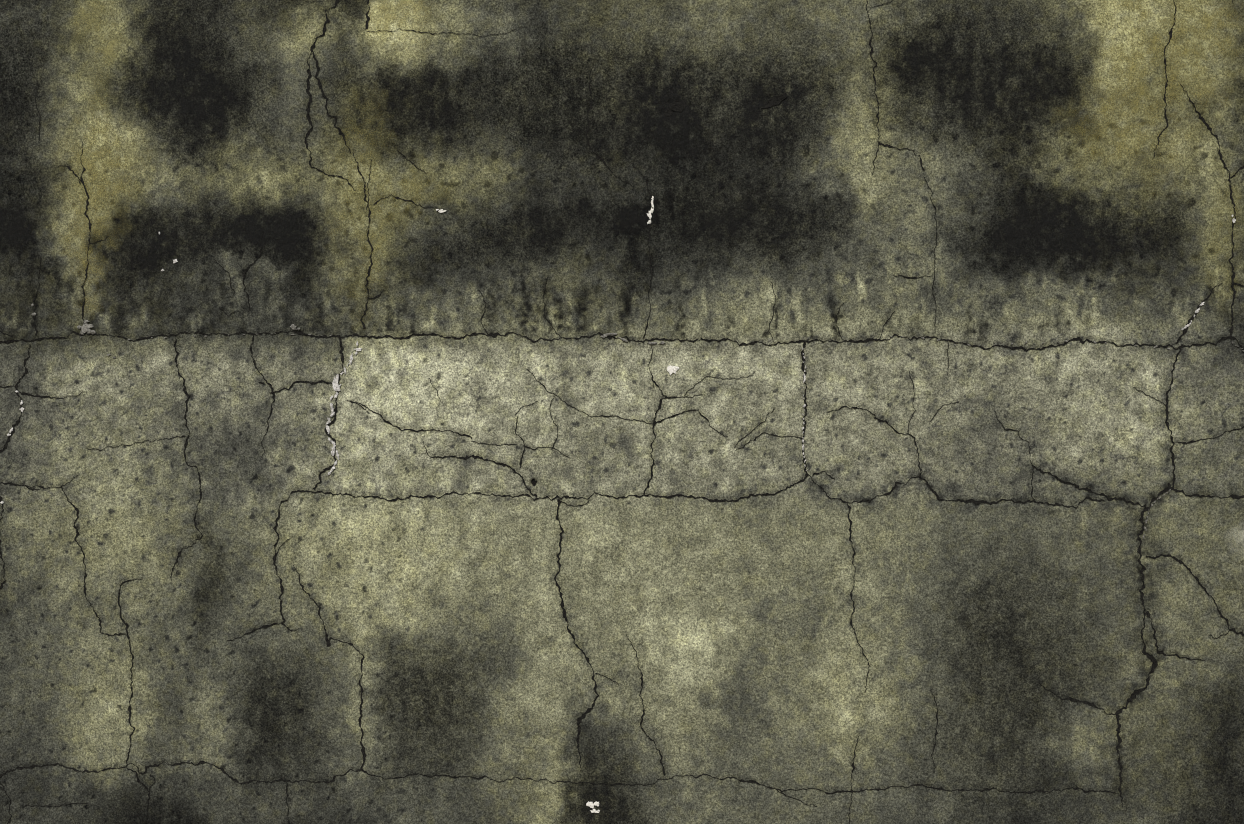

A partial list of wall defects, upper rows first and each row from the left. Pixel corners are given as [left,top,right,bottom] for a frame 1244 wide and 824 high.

leakage [0,65,36,270]
crack [60,142,109,324]
leakage [125,0,259,167]
leakage [66,140,320,288]
crack [304,0,437,329]
leakage [343,44,846,333]
crack [865,0,937,325]
leakage [888,9,1078,180]
leakage [970,185,1184,272]
crack [0,257,617,581]
crack [227,67,1244,807]
crack [0,474,1115,824]